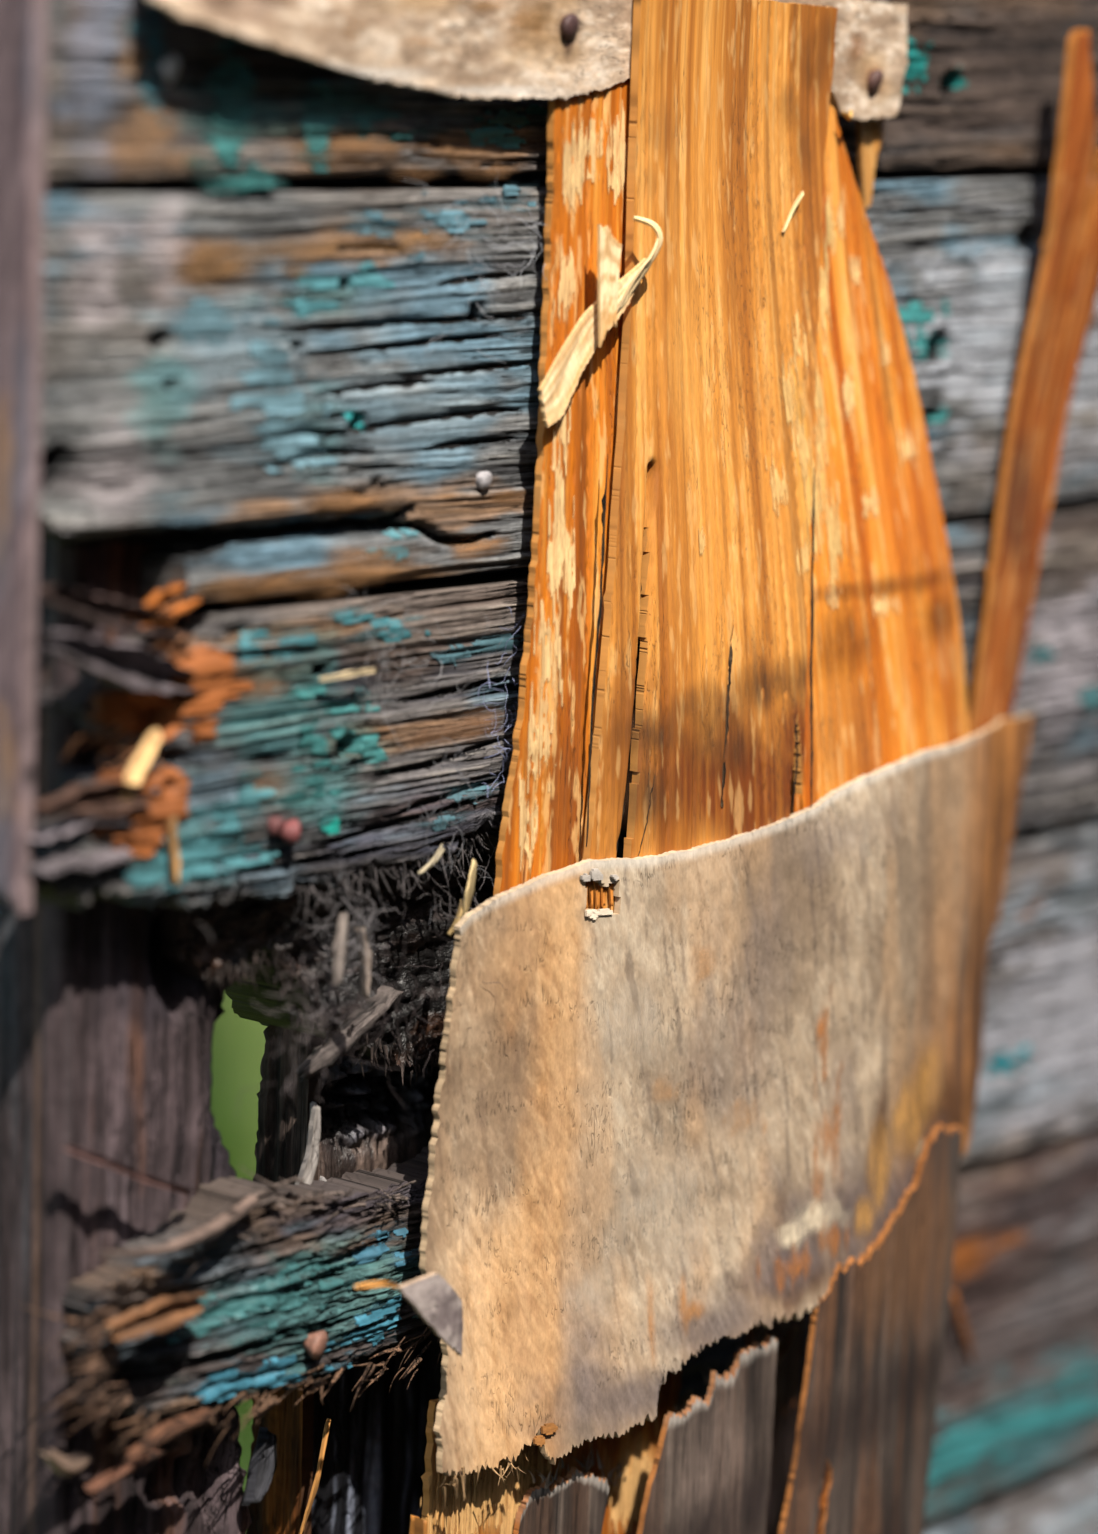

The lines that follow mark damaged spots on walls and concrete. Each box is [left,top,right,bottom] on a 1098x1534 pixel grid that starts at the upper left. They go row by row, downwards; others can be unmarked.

peeling [184,35,276,193]
peeling [298,80,436,171]
peeling [236,630,318,661]
peeling [335,607,524,666]
crack [586,454,655,856]
crack [792,467,815,810]
crack [721,624,734,807]
peeling [122,683,391,901]
peeling [427,782,492,831]
peeling [189,1354,306,1403]
peeling [167,1228,420,1344]
peeling [323,1295,422,1370]